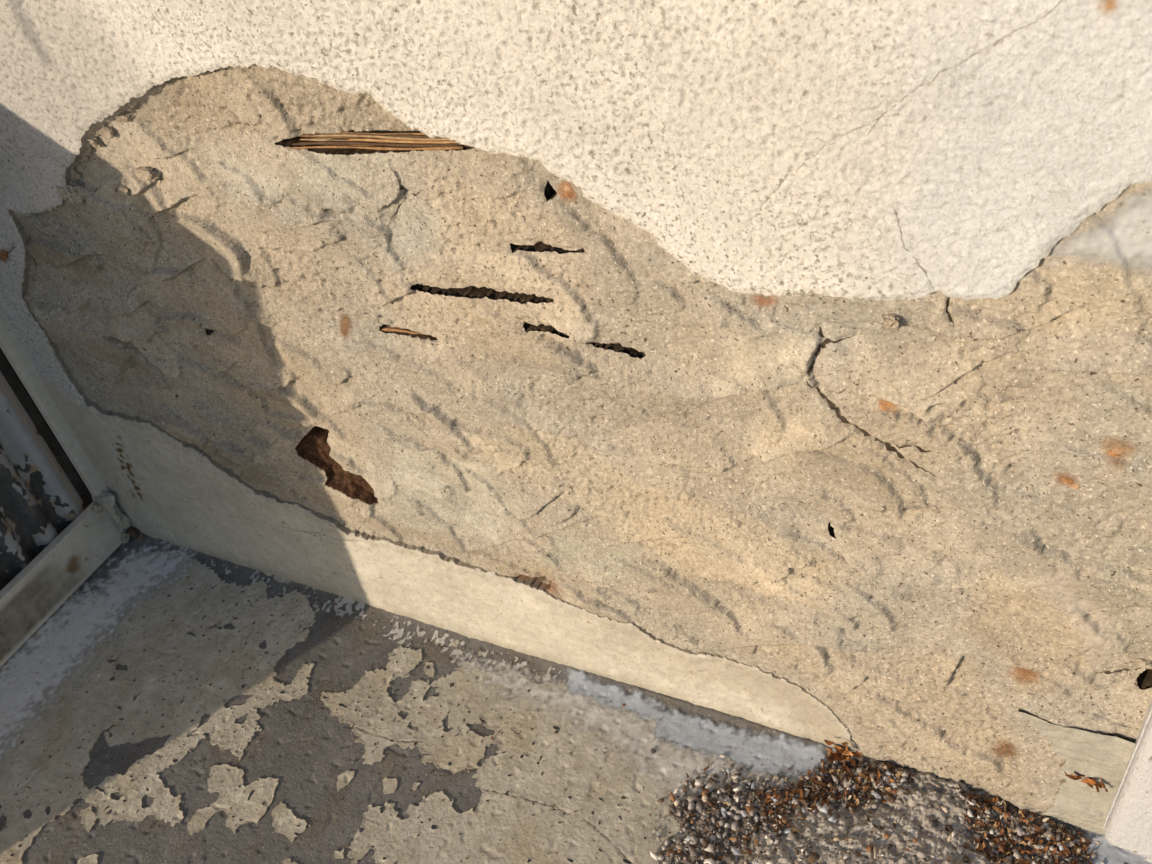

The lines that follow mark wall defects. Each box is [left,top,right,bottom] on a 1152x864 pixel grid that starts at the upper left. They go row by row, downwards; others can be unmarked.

spalling [275,137,318,147]
spalling [309,146,389,154]
flaking render [134,166,162,182]
peeling [1050,181,1152,267]
spalling [391,332,437,340]
flaking render [882,313,902,331]
crack [806,326,936,477]
peeling [0,371,320,864]
flaking render [1135,658,1152,669]
peeling [320,646,1020,864]
spalling [987,797,1030,839]
spalling [1014,814,1090,864]